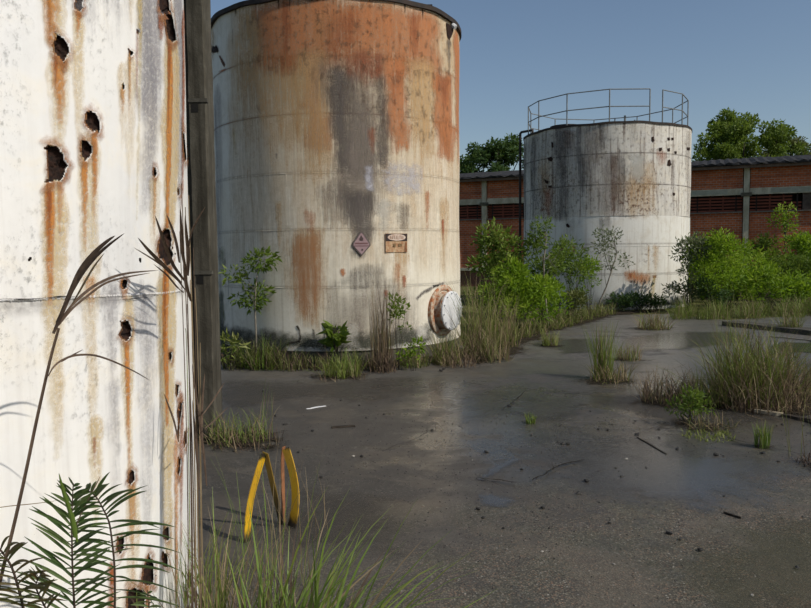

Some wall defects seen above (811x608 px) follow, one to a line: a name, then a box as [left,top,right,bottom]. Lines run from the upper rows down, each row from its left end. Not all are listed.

corrosion [44,141,72,329]
corrosion [48,0,86,129]
corrosion [80,110,102,247]
corrosion [120,279,134,426]
corrosion [121,0,142,103]
corrosion [146,240,188,584]
corrosion [153,3,188,245]
corrosion [293,232,321,319]
damp [324,71,387,240]
corrosion [348,18,459,172]
corrosion [628,273,657,290]
corrosion [127,572,157,608]